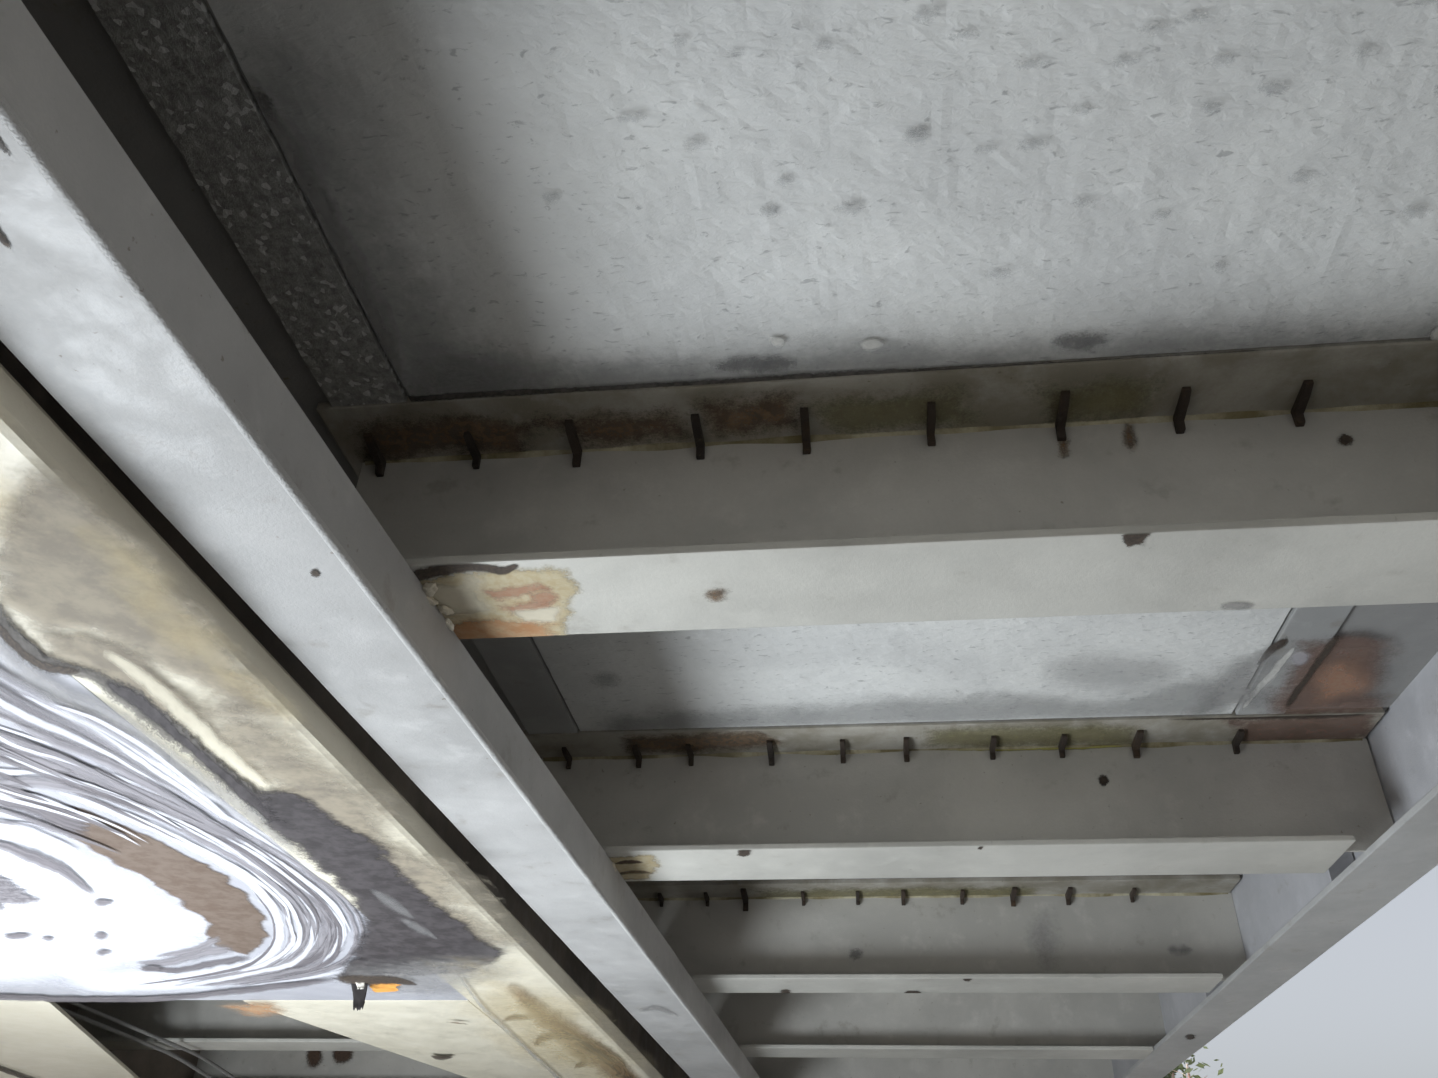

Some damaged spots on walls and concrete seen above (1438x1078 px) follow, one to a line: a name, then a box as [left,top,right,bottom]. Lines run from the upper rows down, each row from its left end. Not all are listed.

rust [1124,424,1136,448]
rust [1338,434,1353,446]
peeling [414,564,578,639]
rust [1171,636,1383,742]
water stain [0,474,505,1002]
rust [624,731,781,754]